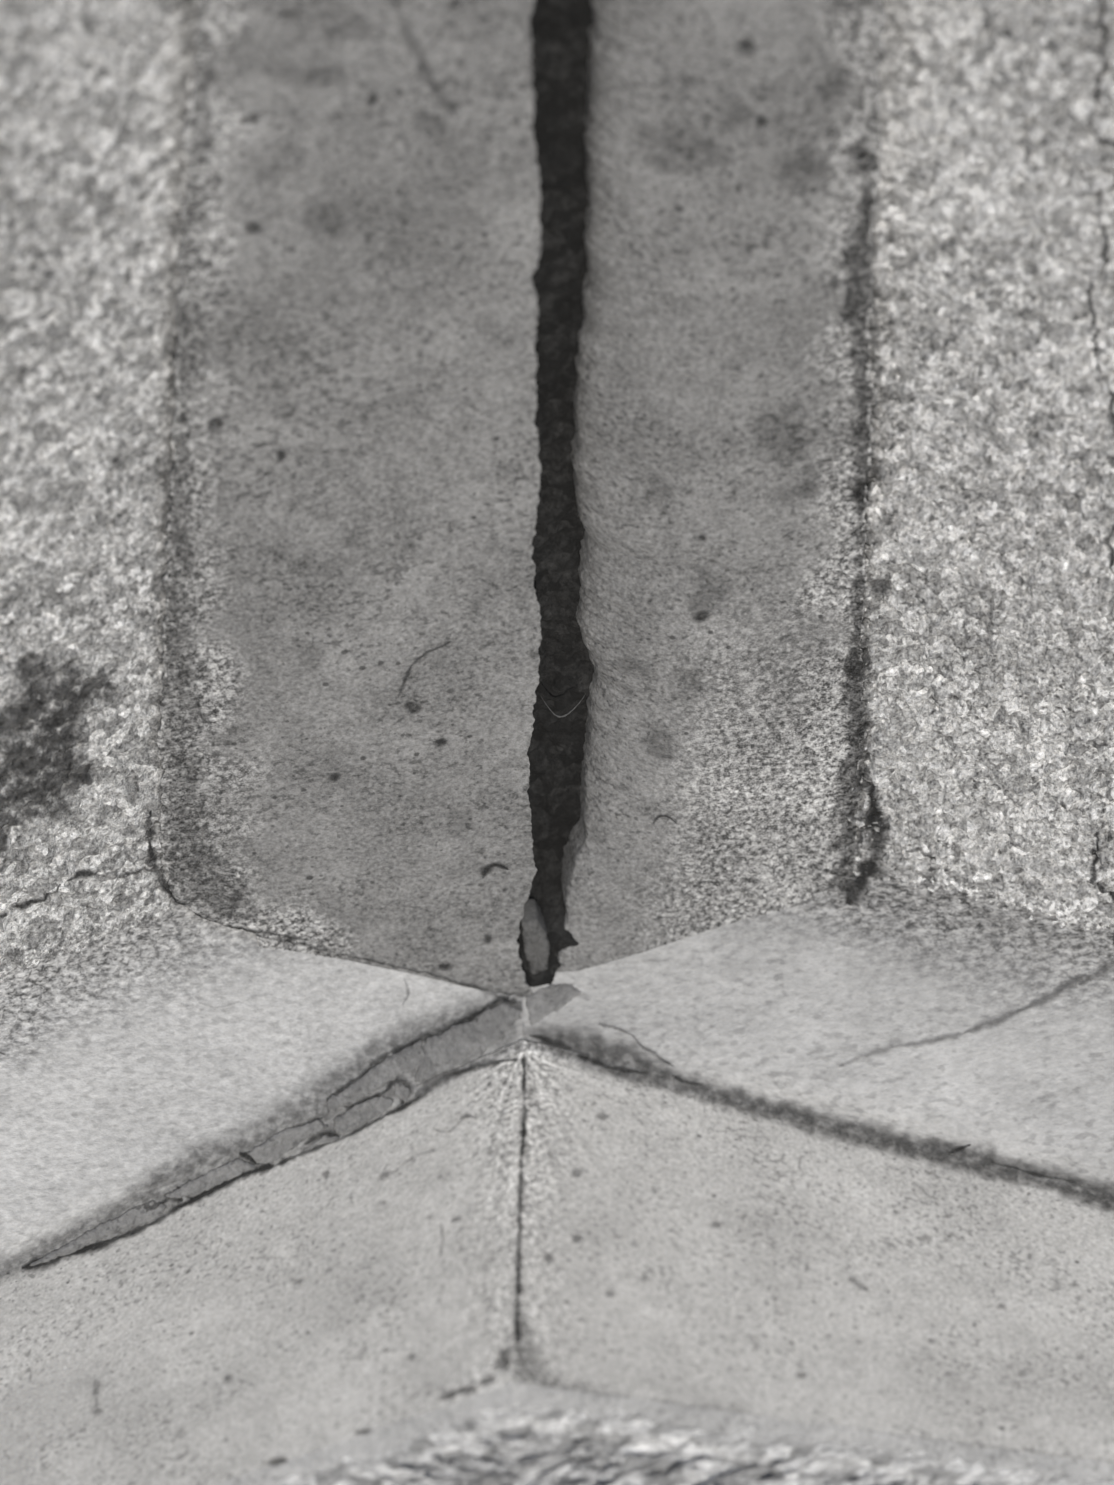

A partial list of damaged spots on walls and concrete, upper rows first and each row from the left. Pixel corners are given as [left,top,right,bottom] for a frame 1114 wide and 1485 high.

crack [1087,0,1114,425]
crack [1105,526,1114,571]
leakage [0,654,108,853]
crack [1091,832,1114,901]
crack [965,936,1114,1033]
crack [22,959,701,1343]
crack [949,1144,971,1154]